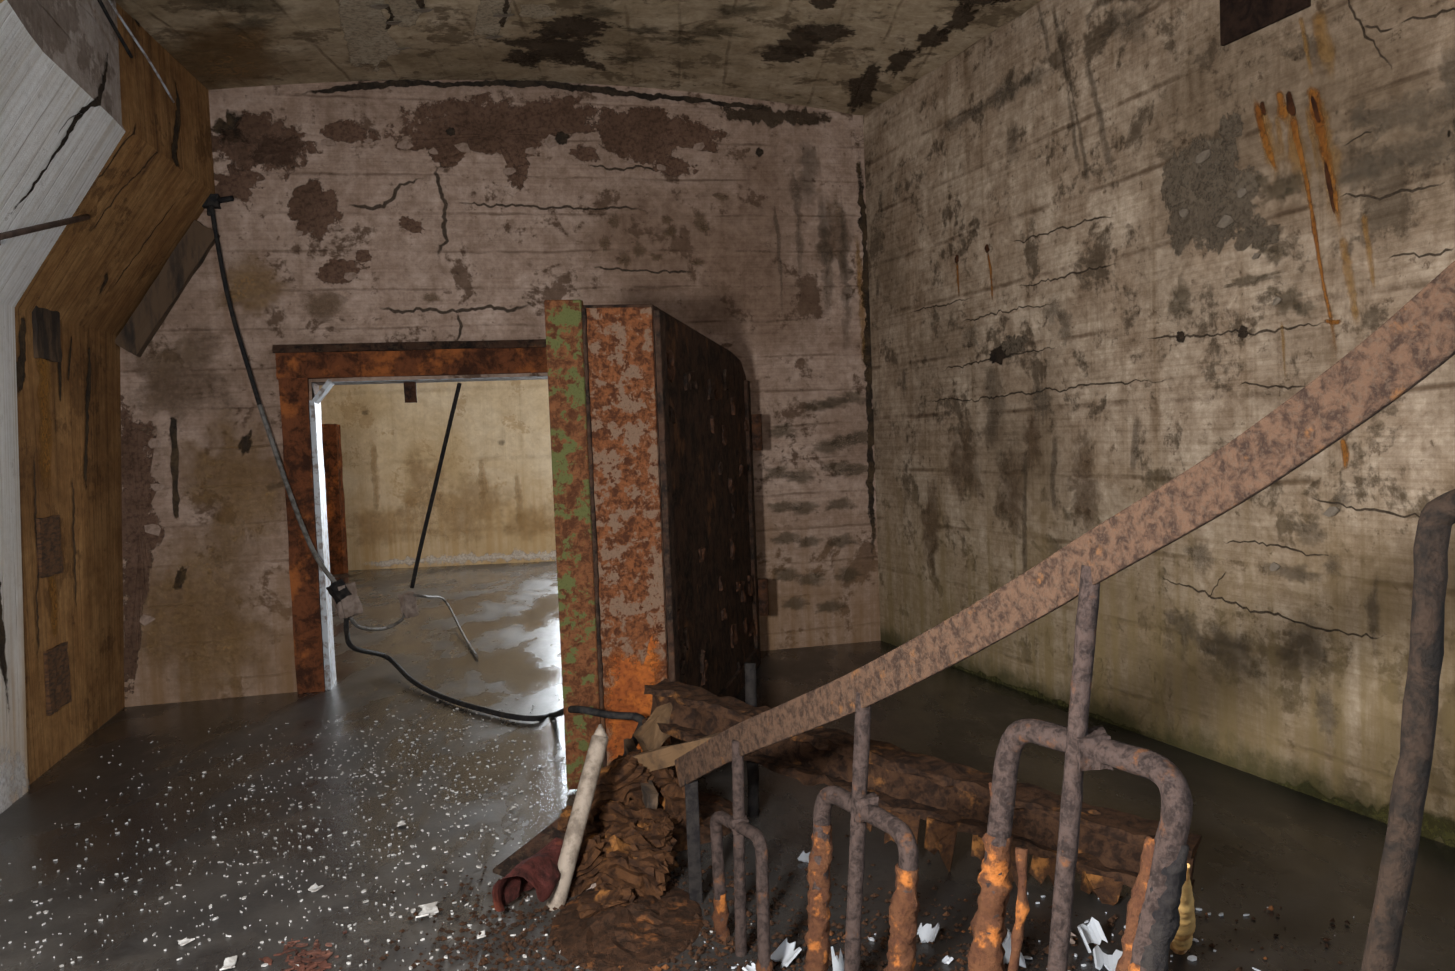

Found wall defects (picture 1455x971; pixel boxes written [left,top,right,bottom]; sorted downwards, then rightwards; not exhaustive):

spalling [473,0,622,71]
spalling [761,0,856,63]
crack [15,54,108,209]
spalling [211,92,730,243]
crack [352,168,636,253]
corrosion [1254,88,1356,331]
spalling [309,249,372,317]
crack [384,295,526,340]
crack [1152,323,1319,339]
corrosion [1340,439,1349,467]
water stain [140,341,283,694]
crack [1168,540,1377,639]